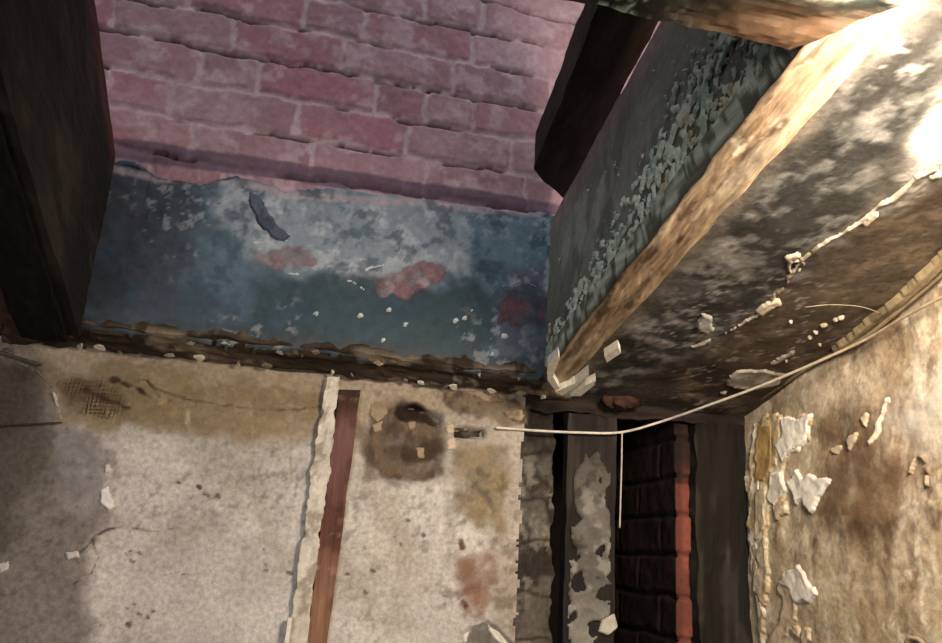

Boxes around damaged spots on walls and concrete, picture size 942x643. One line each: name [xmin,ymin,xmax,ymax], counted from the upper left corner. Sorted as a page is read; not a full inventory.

peeling [365,261,445,312]
spalling [0,288,39,345]
peeling [744,412,832,643]